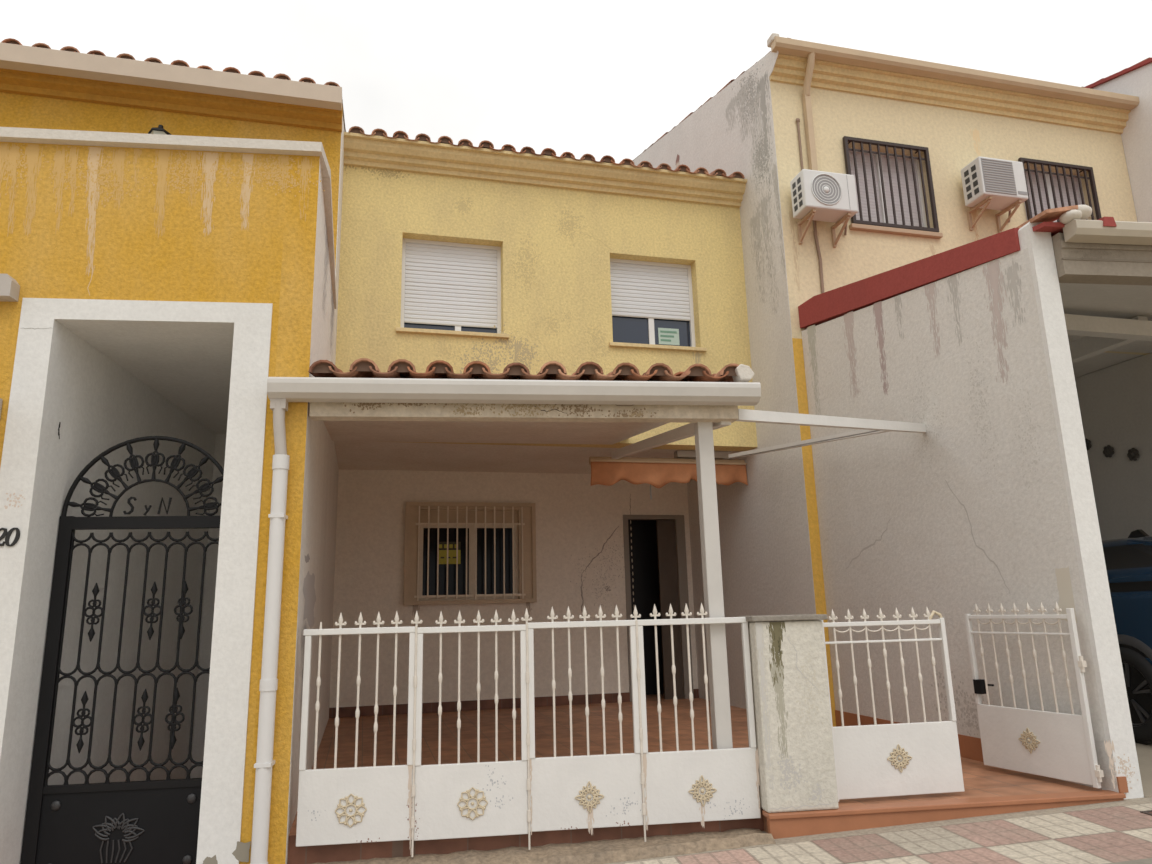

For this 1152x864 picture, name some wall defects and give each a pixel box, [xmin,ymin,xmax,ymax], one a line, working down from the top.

leakage [0,143,325,277]
leakage [725,68,820,313]
leakage [844,311,859,397]
leakage [873,295,904,395]
leakage [904,260,1041,489]
crack [580,494,631,621]
leakage [755,622,829,801]
spalling [232,841,251,862]